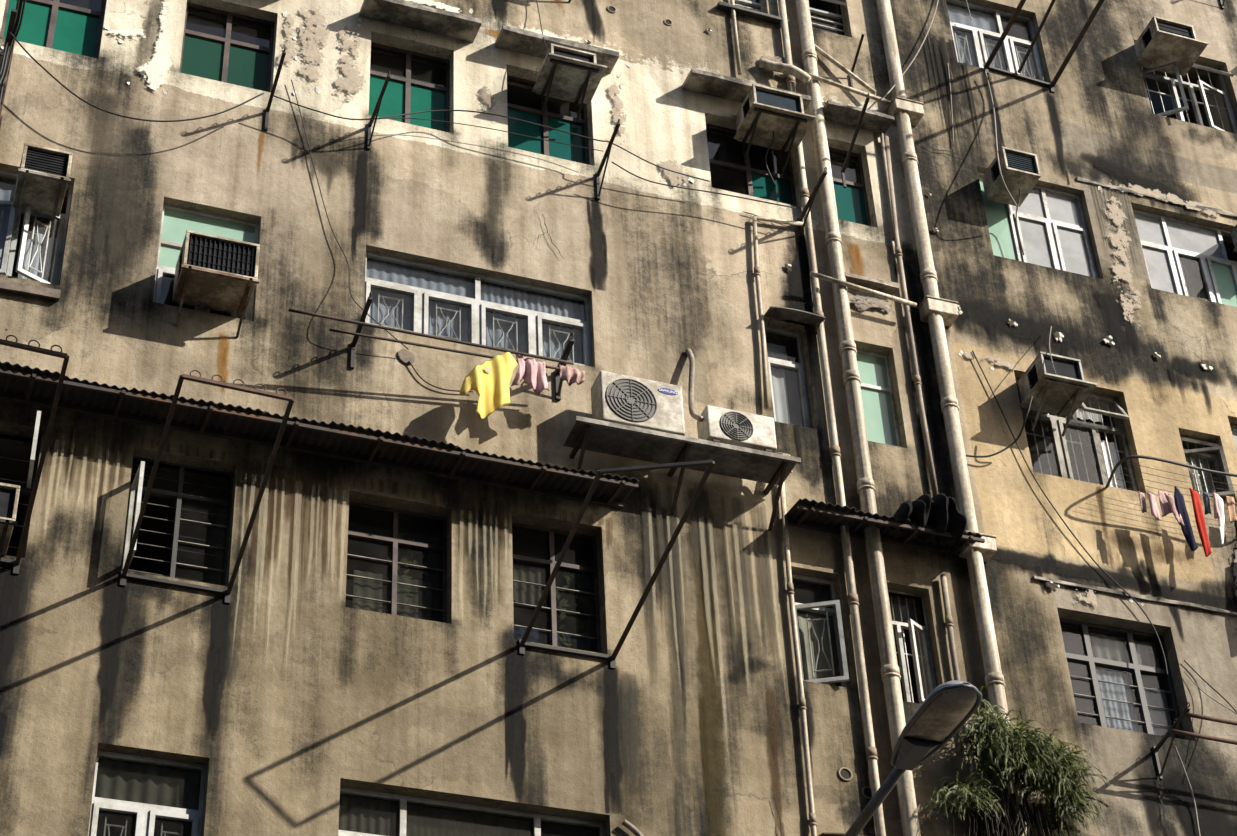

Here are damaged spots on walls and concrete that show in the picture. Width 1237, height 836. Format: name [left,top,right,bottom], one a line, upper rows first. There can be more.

peeling [104,0,171,95]
peeling [276,7,365,102]
leakage [1047,94,1070,185]
leakage [1083,153,1175,206]
peeling [1098,180,1232,329]
leakage [894,259,938,471]
leakage [945,300,1097,357]
leakage [98,583,127,723]
leakage [203,597,231,735]
leakage [505,648,526,797]
leakage [604,665,623,813]
leakage [983,548,1237,638]